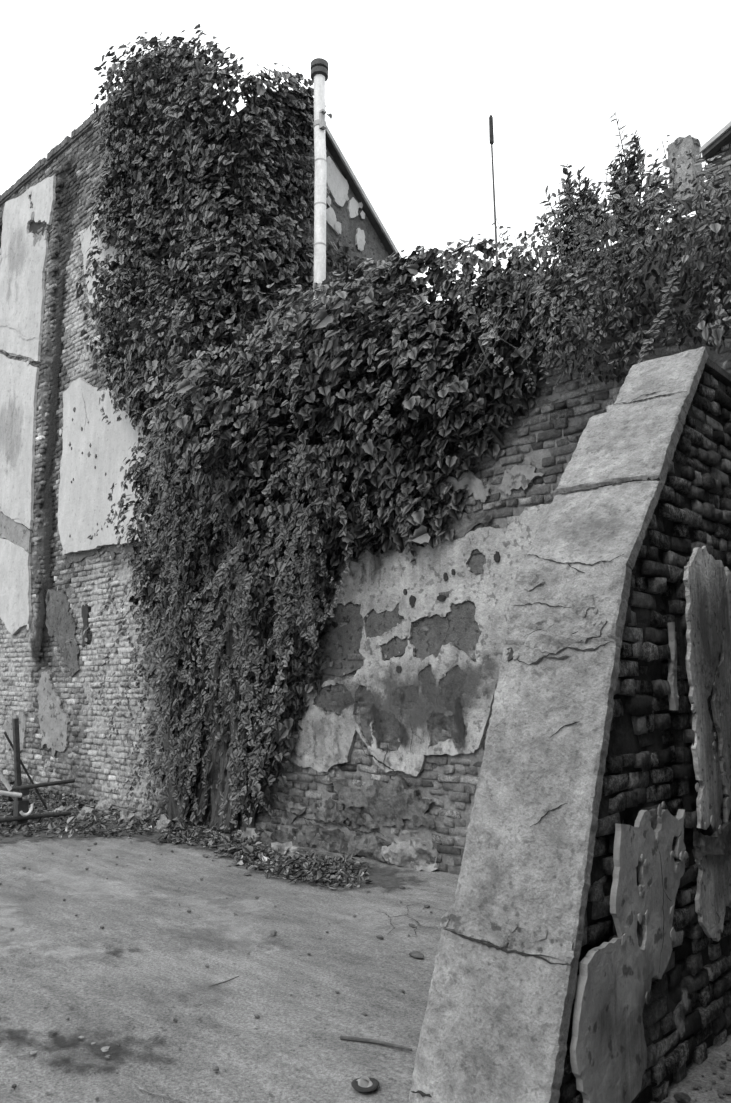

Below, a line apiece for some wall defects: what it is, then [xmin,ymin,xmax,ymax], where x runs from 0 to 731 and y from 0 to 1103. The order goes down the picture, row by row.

flaking render [326,156,366,251]
flaking render [80,196,132,326]
flaking render [0,175,56,635]
flaking render [58,378,154,567]
crack [528,554,624,573]
flaking render [45,589,89,677]
flaking render [272,457,607,830]
crack [515,602,610,665]
flaking render [3,670,70,758]
flaking render [440,546,731,1103]
crack [378,903,567,965]